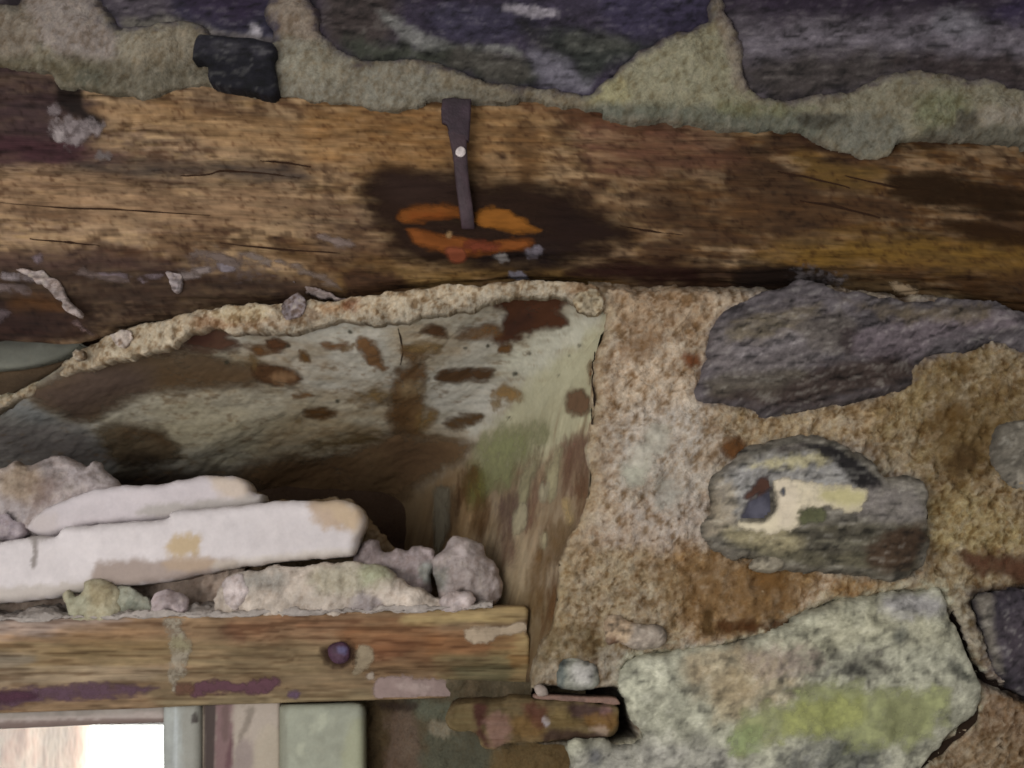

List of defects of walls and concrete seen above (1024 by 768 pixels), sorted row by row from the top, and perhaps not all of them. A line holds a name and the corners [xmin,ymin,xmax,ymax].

corrosion [397,205,540,263]
water stain [360,167,699,287]